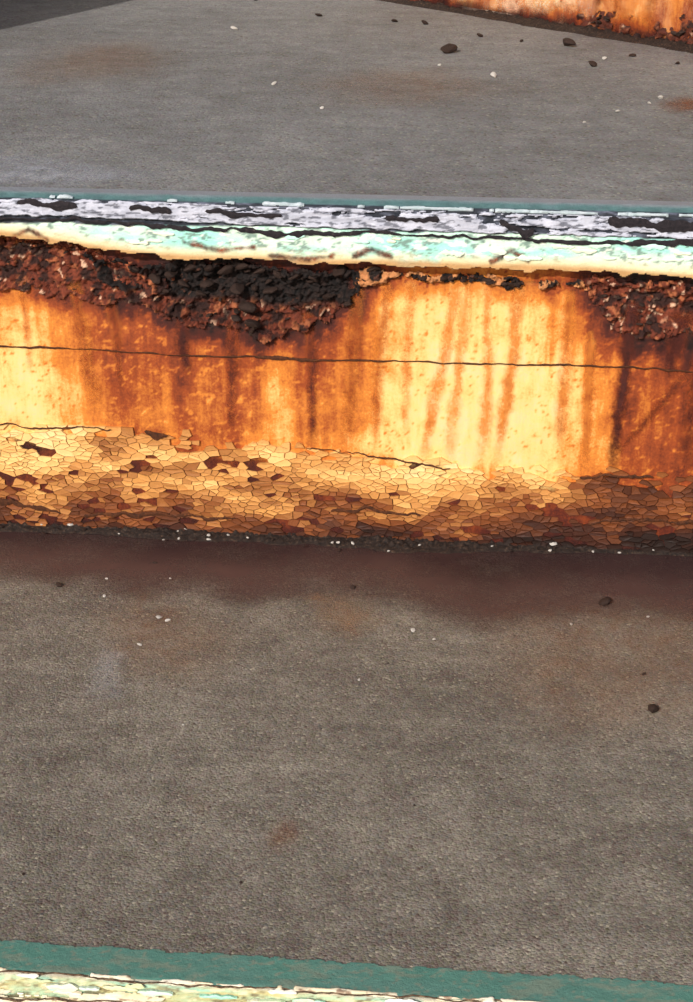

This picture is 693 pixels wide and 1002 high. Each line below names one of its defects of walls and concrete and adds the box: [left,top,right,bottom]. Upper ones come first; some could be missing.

corrosion [410,0,693,44]
peeling [0,194,693,262]
spalling [0,236,524,345]
spalling [538,274,693,340]
crack [0,345,693,373]
corrosion [0,235,693,500]
crack [0,422,693,553]
peeling [0,967,417,1002]